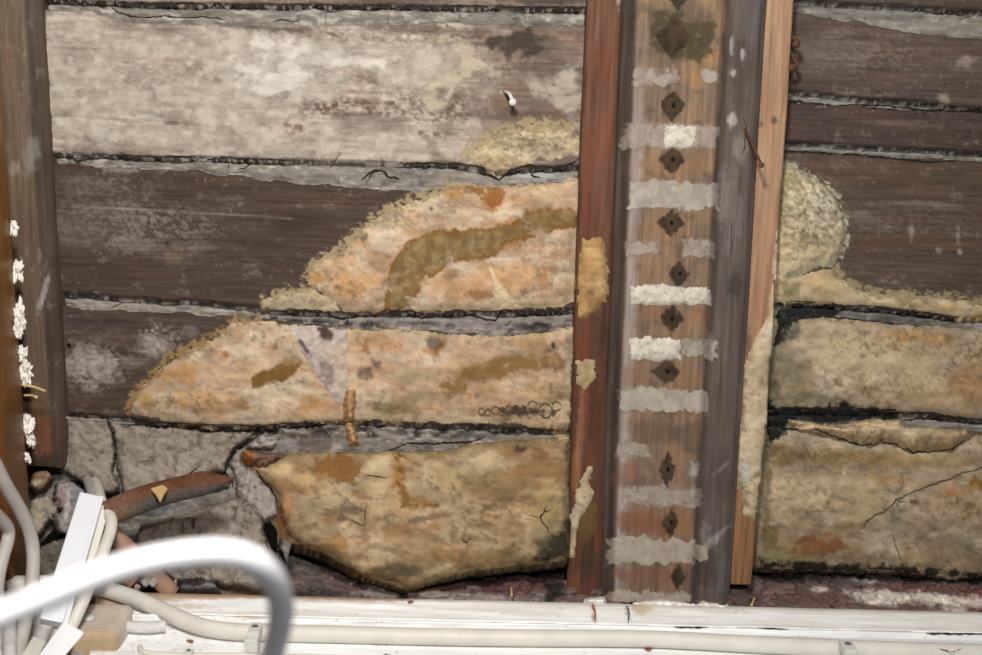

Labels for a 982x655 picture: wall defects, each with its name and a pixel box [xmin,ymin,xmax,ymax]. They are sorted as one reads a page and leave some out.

crack [811,415,982,454]
peeling [151,485,168,502]
crack [861,467,982,529]